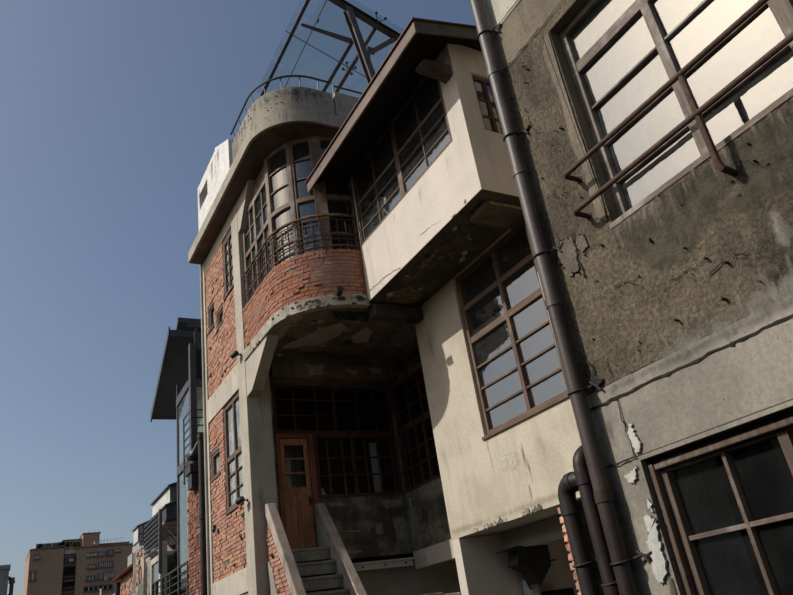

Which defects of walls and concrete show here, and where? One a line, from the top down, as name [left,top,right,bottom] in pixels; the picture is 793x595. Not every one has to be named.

spalling [557,234,589,277]
peeling [268,275,373,357]
crack [590,314,793,468]
peeling [624,465,638,484]
peeling [627,423,642,453]
peeling [642,498,668,584]